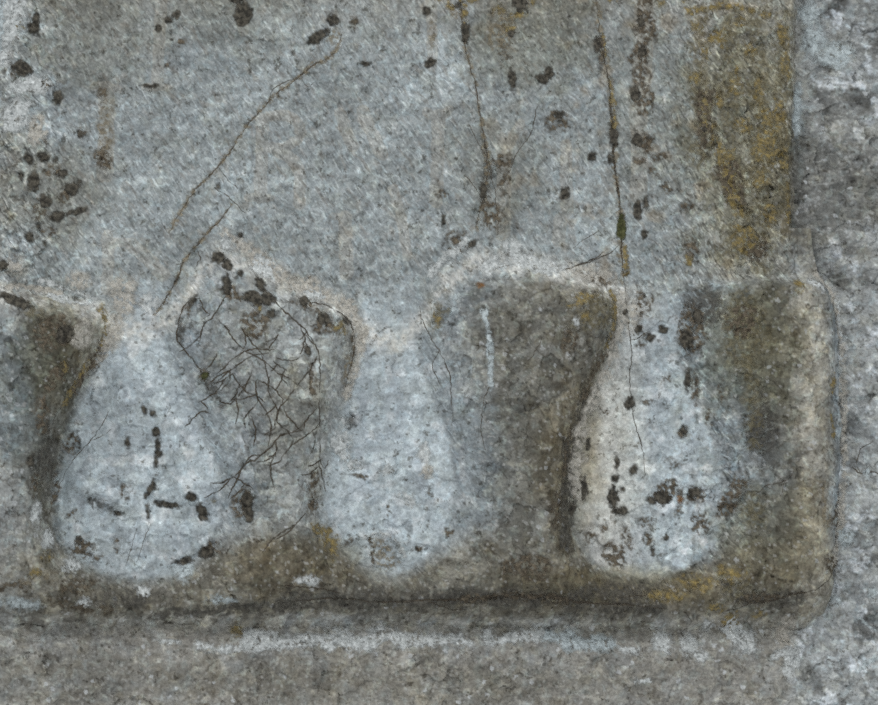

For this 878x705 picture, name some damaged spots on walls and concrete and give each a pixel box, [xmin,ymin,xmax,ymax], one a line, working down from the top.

crack [154,34,342,498]
crack [312,302,355,386]
crack [459,0,537,230]
crack [563,2,643,387]
crack [264,513,306,550]